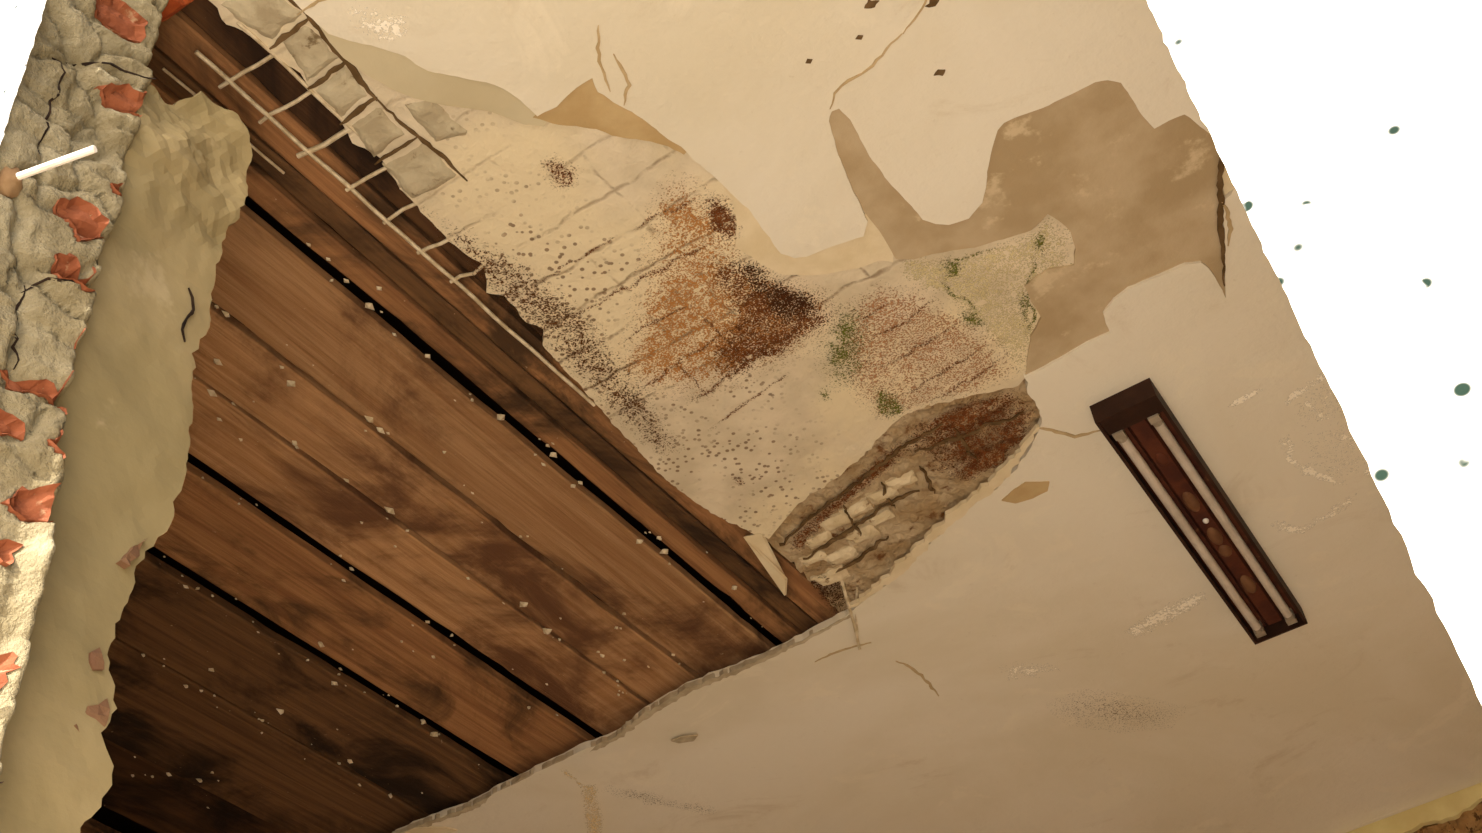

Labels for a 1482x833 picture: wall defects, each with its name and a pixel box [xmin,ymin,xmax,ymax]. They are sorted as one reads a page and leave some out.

crack [830,0,927,109]
flaking render [51,196,109,292]
crack [1216,157,1234,287]
water stain [904,218,1071,368]
water stain [818,298,872,400]
flaking render [0,369,74,459]
flaking render [94,0,1234,833]
water stain [876,390,903,420]
flaking render [0,483,61,522]
flaking render [0,539,23,567]
flaking render [88,647,104,671]
flaking render [74,699,110,731]